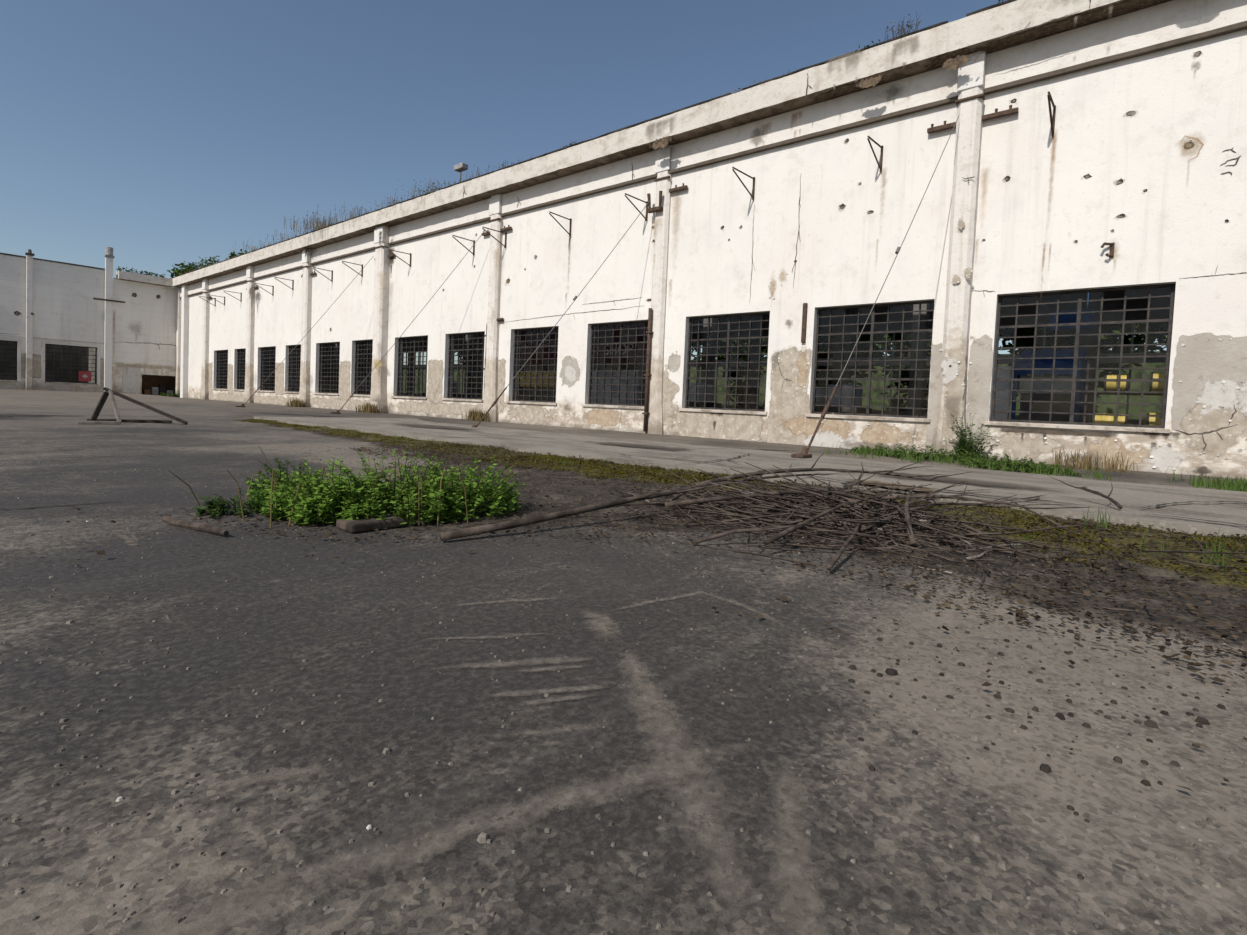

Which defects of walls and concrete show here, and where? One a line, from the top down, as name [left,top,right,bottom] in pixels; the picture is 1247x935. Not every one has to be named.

spalling [923,0,1165,70]
peeling [663,335,1064,461]
peeling [1080,333,1247,473]